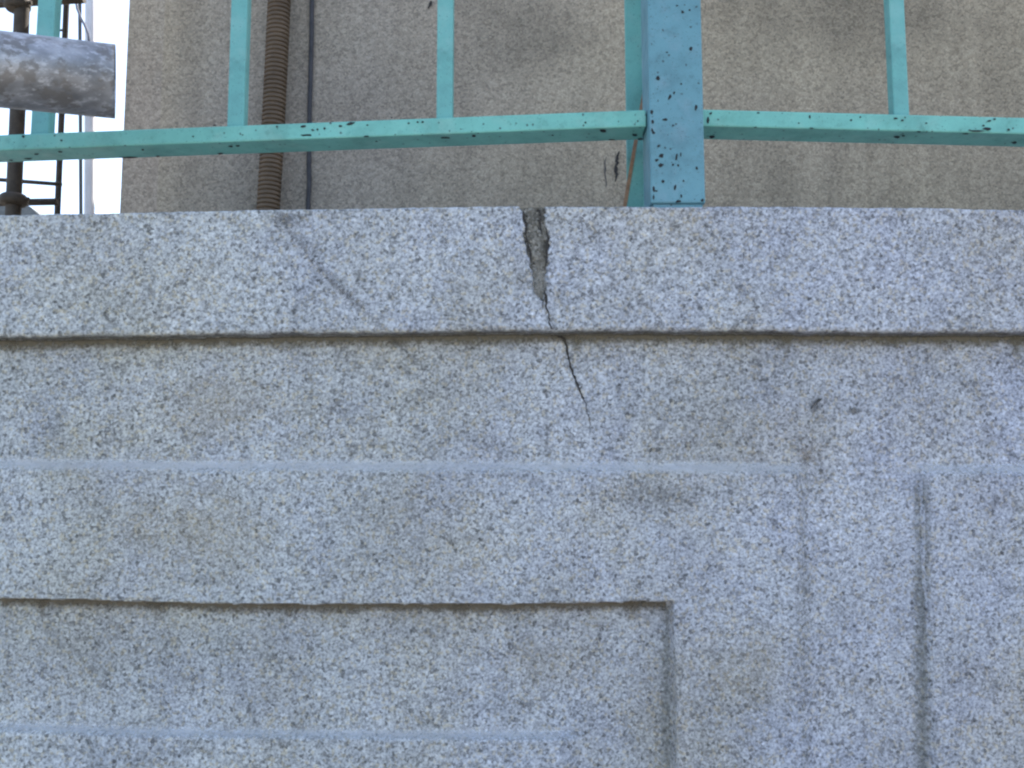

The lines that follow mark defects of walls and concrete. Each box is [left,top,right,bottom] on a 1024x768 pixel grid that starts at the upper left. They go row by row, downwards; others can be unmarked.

crack [542,281,591,425]